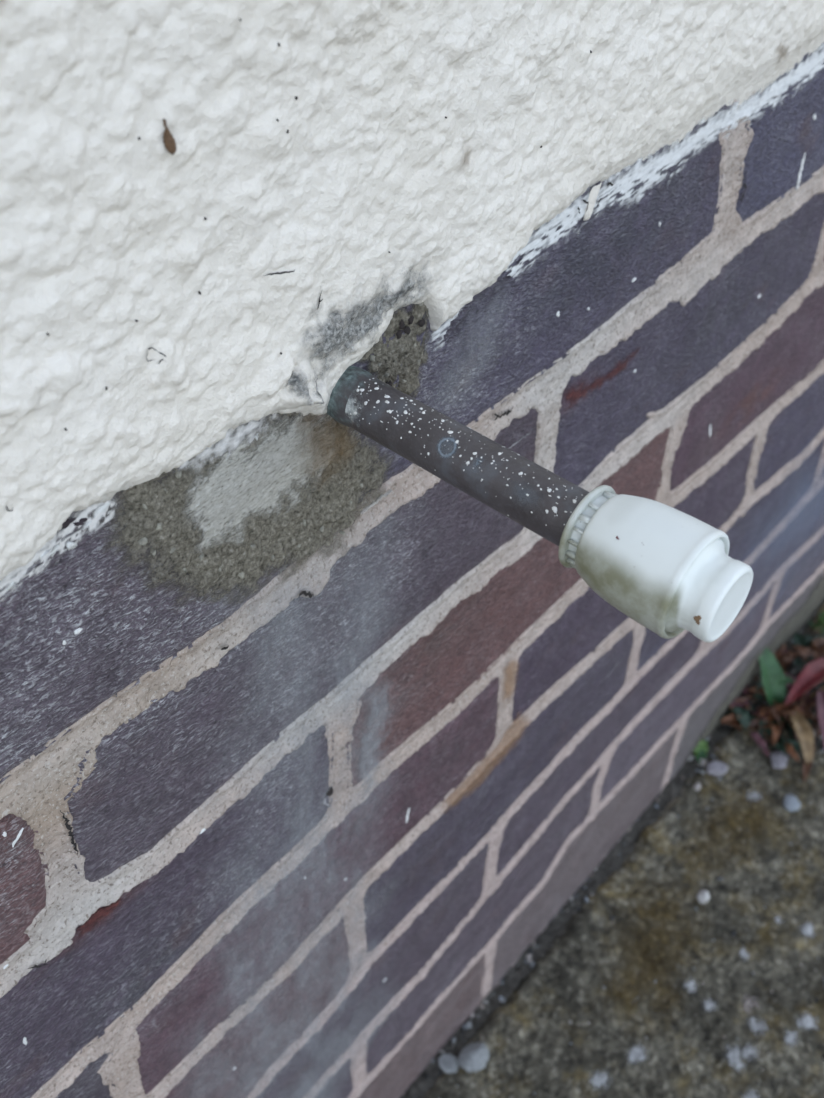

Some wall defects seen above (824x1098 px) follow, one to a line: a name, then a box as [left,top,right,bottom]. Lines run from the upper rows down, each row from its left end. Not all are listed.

spalling [361,302,429,396]
spalling [0,372,388,601]